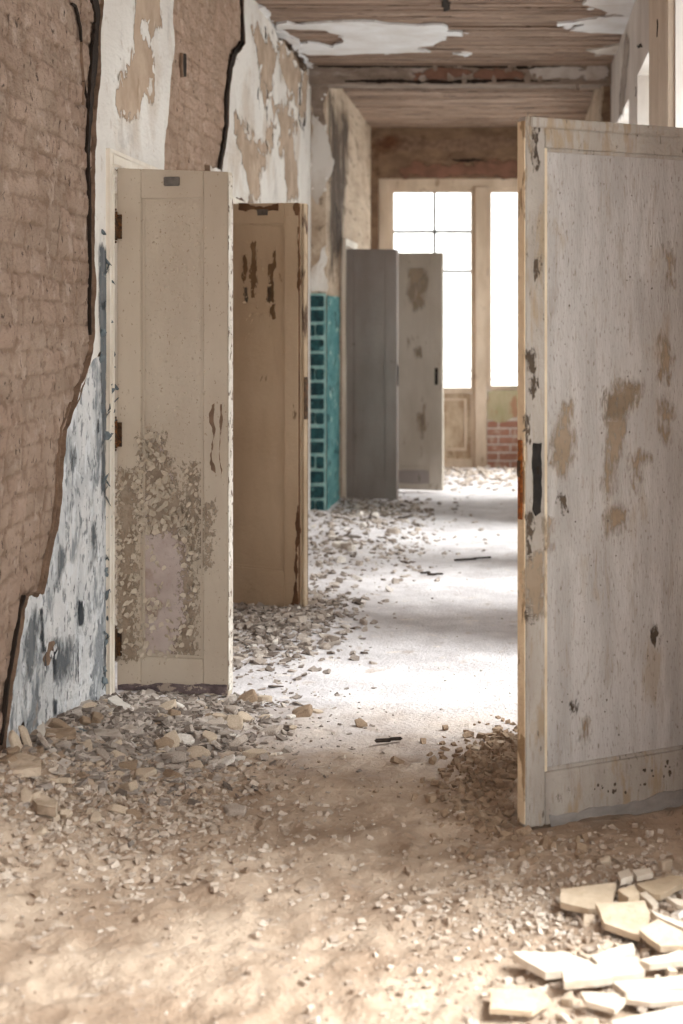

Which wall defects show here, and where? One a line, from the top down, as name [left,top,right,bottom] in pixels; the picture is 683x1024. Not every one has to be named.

water stain [329,100,349,274]
spalling [0,0,469,732]
peeling [598,370,641,535]
peeling [647,624,668,657]